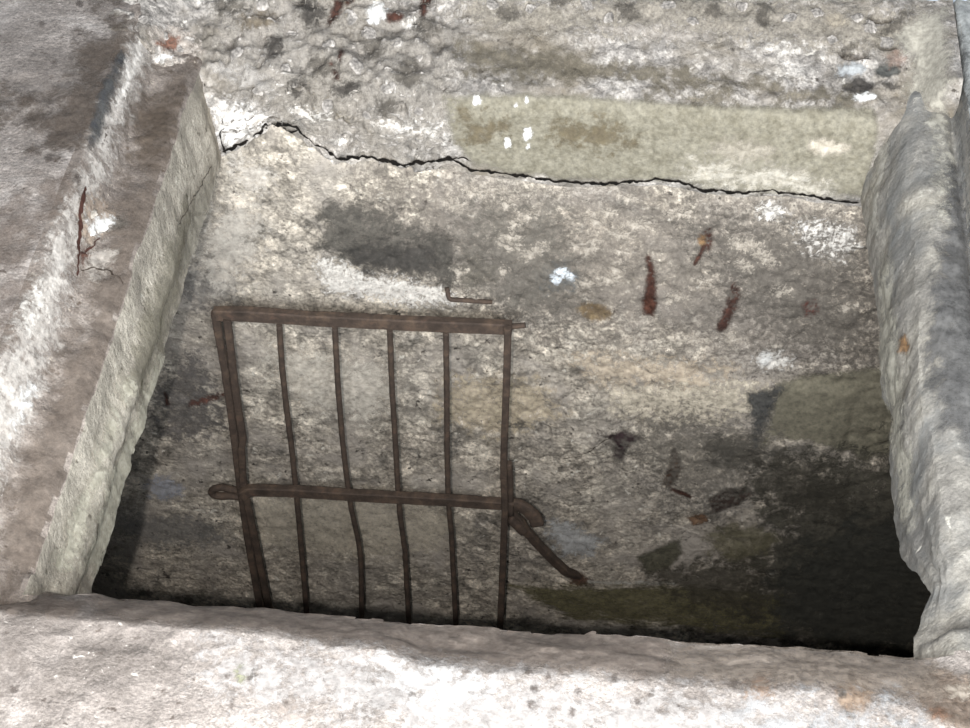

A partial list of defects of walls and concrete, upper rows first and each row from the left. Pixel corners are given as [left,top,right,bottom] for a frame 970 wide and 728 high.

rust [327,0,354,25]
rust [386,12,403,22]
rust [420,0,431,17]
crack [175,119,858,235]
damp [303,180,655,331]
rust [693,228,712,266]
rust [642,256,657,316]
rust [717,282,741,332]
damp [571,135,931,658]